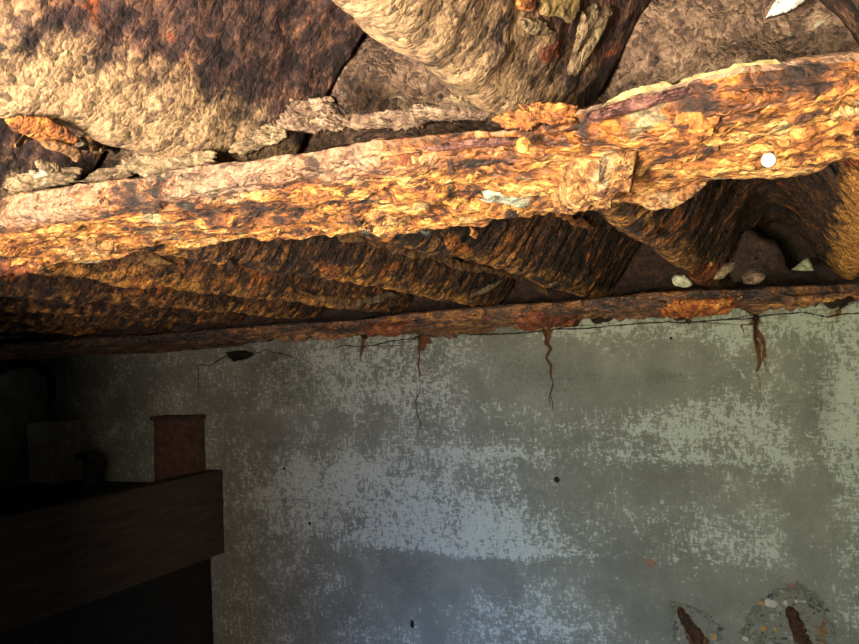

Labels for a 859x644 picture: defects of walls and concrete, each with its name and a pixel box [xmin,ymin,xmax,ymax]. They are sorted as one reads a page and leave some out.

corrosion [539,41,561,64]
corrosion [701,145,721,156]
corrosion [253,182,285,190]
corrosion [138,200,163,214]
corrosion [336,213,364,227]
corrosion [504,205,519,219]
corrosion [440,231,473,256]
corrosion [830,296,859,315]
corrosion [740,313,772,389]
corrosion [415,335,432,432]
spalling [670,602,724,644]
spalling [741,582,834,644]